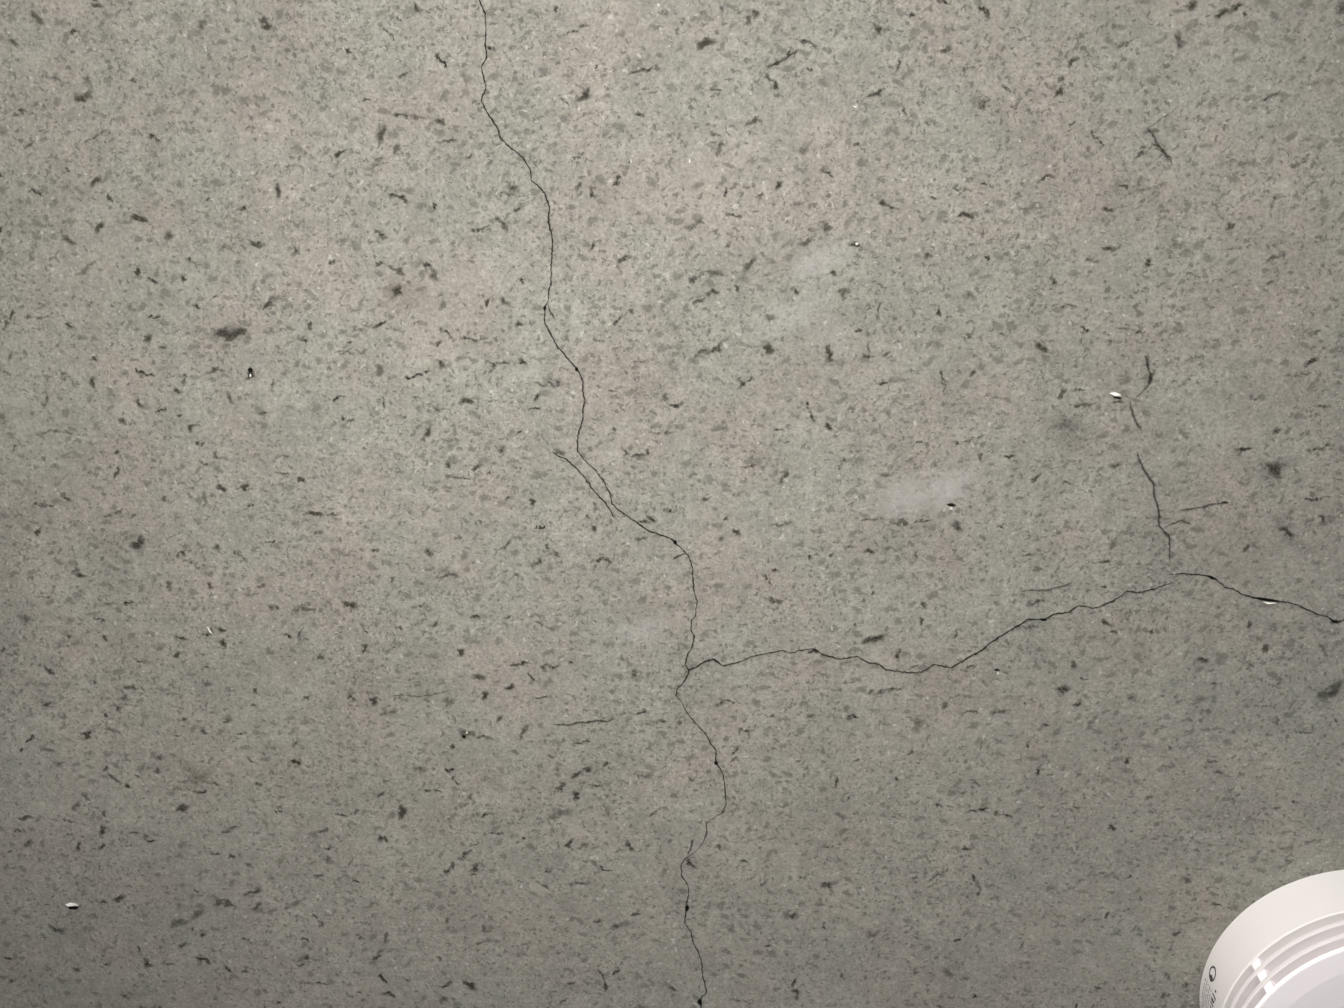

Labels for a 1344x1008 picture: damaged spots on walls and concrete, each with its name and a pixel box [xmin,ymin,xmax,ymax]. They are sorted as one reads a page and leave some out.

crack [478,0,1344,1008]